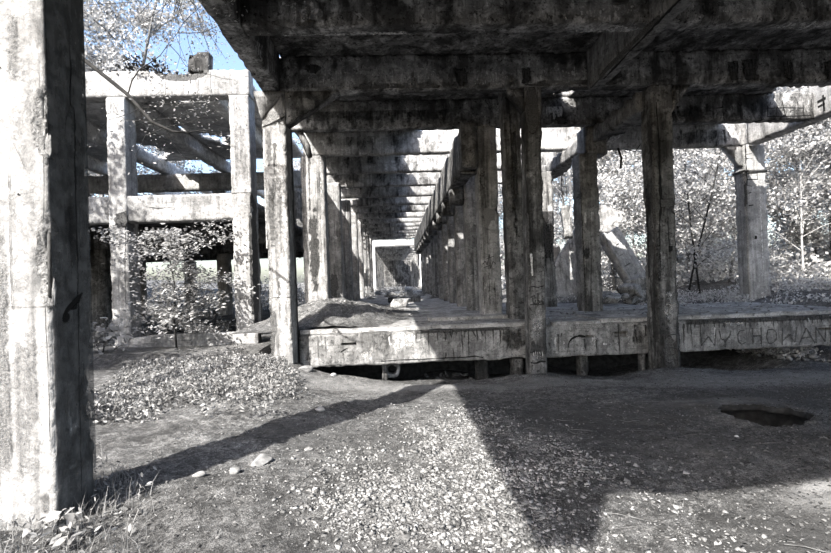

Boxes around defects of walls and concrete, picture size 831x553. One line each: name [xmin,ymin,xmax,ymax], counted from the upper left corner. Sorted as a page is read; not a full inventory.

damp [728,59,759,81]
damp [263,122,335,364]
damp [330,274,339,296]